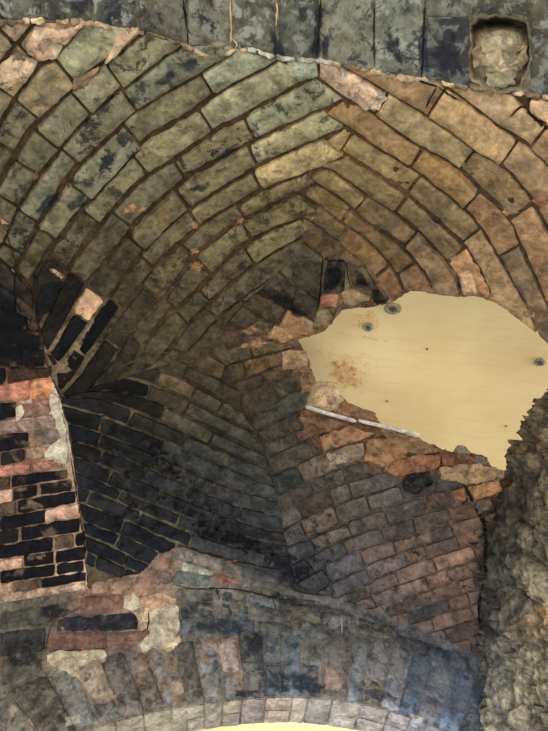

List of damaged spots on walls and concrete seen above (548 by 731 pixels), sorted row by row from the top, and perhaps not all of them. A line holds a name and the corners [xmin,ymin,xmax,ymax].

spalling [241,285,548,348]
spalling [281,350,510,515]